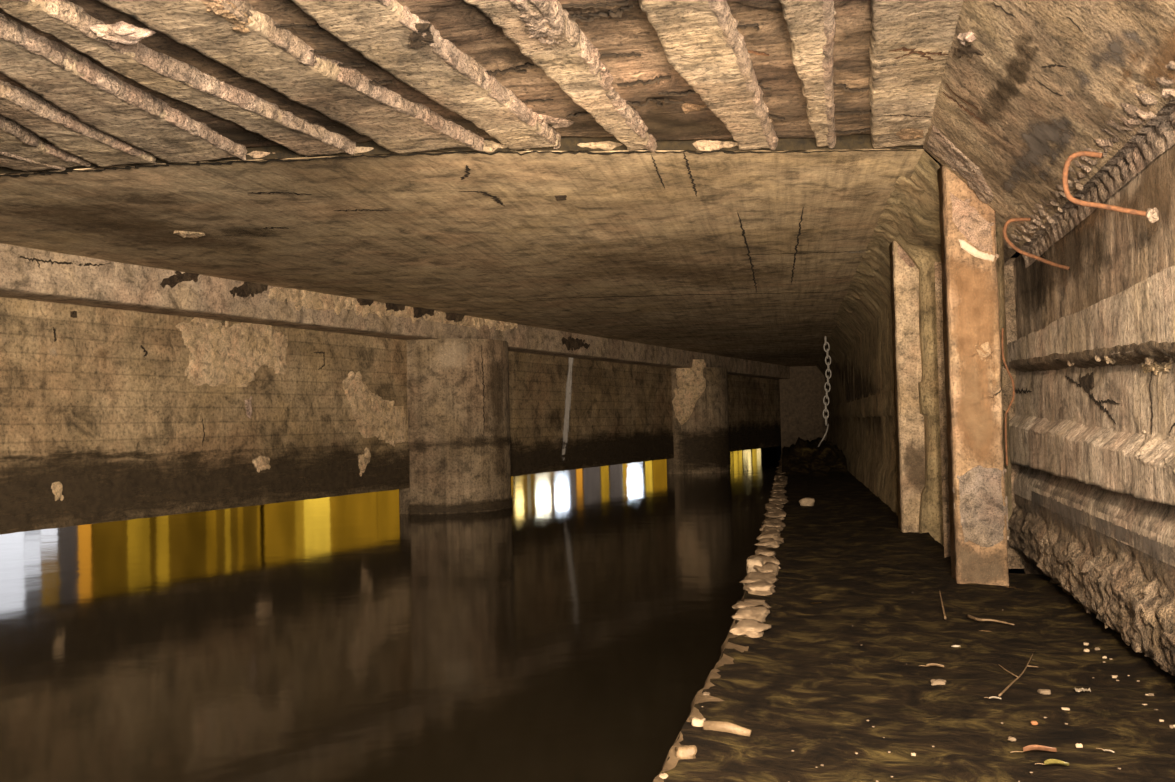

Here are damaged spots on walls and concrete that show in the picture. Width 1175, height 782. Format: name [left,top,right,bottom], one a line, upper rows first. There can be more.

spalling [0,0,374,171]
spalling [201,0,508,153]
spalling [377,0,575,149]
spalling [509,0,657,153]
spalling [693,140,738,151]
spalling [926,125,1147,270]
peeling [176,317,289,418]
spalling [343,371,406,476]
water stain [0,357,781,534]
peeling [953,328,1175,547]
crack [1065,374,1119,424]
crack [1149,371,1175,435]